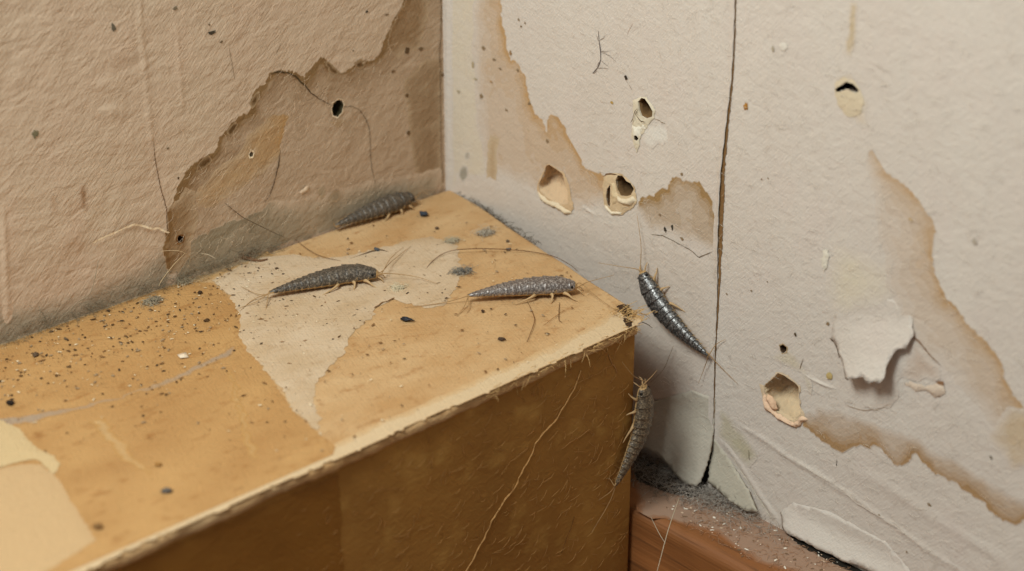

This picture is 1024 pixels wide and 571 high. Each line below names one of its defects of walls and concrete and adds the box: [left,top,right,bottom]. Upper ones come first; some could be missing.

hole [331,98,345,119]
spalling [631,97,669,152]
spalling [834,77,864,117]
water stain [0,0,719,410]
spalling [537,164,574,215]
spalling [602,173,637,215]
crack [652,0,736,412]
water stain [825,149,1024,471]
spalling [759,372,808,428]
crack [701,441,713,485]
water stain [802,407,1024,526]